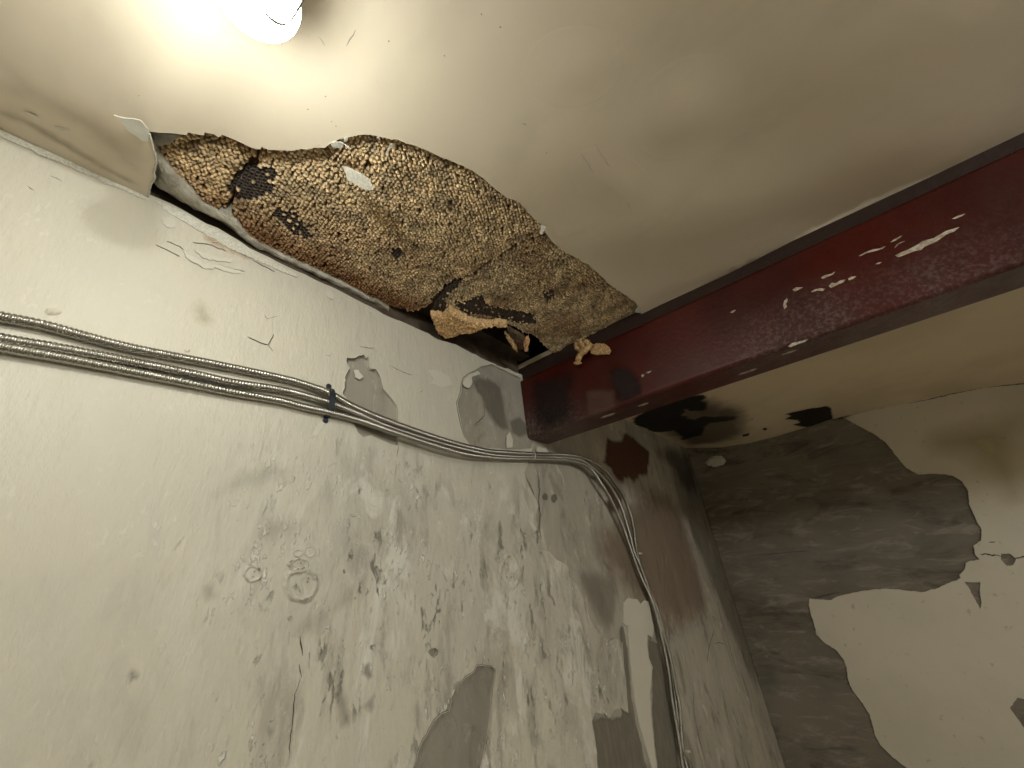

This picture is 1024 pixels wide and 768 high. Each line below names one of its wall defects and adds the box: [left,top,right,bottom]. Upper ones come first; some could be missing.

peeling [114,115,149,142]
peeling [330,137,351,150]
peeling [343,166,374,190]
peeling [0,130,297,278]
peeling [343,357,397,421]
peeling [354,423,396,445]
water stain [634,395,735,440]
peeling [457,365,981,768]
peeling [413,665,494,768]